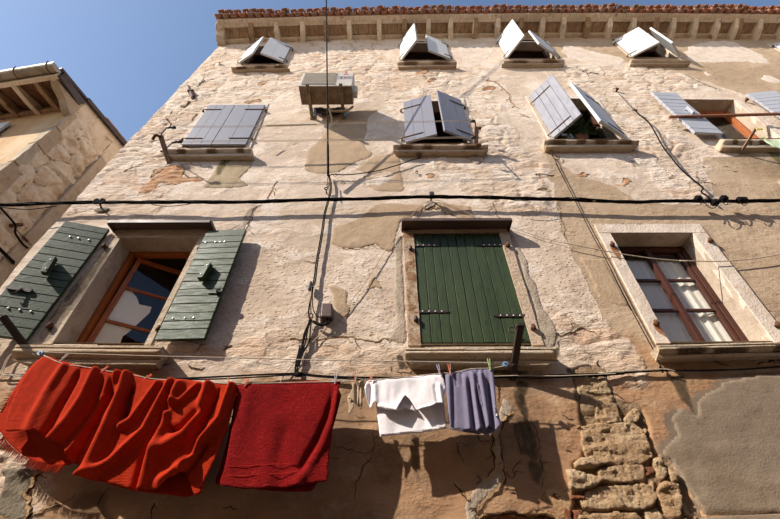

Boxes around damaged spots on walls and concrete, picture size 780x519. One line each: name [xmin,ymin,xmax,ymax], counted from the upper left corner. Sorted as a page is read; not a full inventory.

flaking render [684,41,770,76]
spalling [138,164,204,194]
flaking render [304,109,405,192]
flaking render [331,203,424,251]
flaking render [435,202,476,218]
crack [329,415,380,498]
crack [454,384,552,519]
leakage [514,381,542,482]
flaking render [477,366,703,519]
leakage [670,374,694,412]